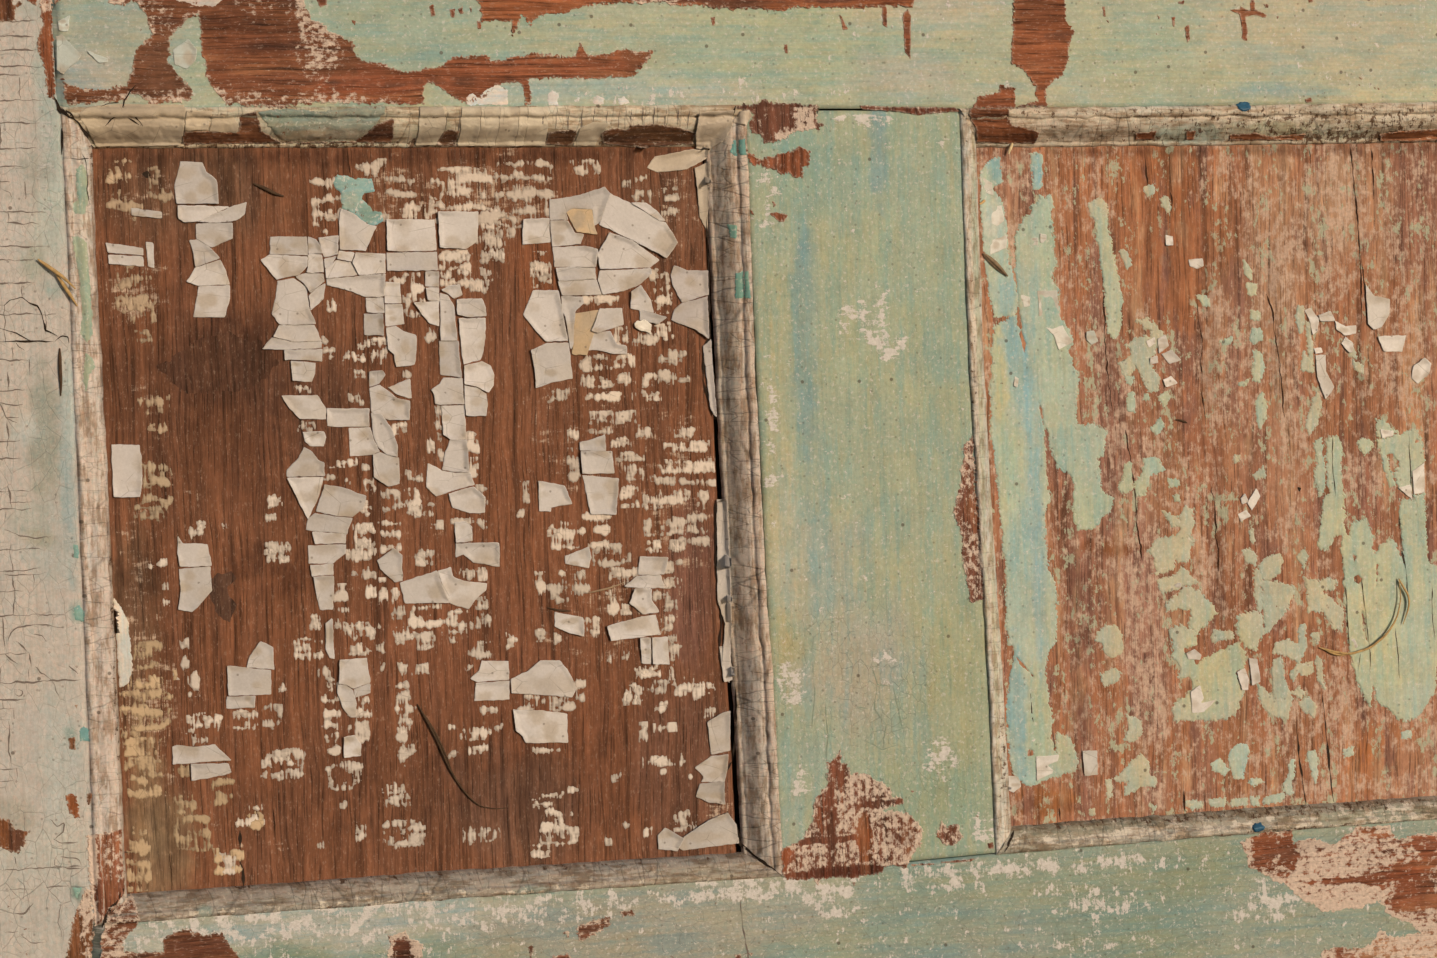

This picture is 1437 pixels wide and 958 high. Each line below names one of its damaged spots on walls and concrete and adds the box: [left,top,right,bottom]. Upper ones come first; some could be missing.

peeling [429,0,914,59]
peeling [860,0,1075,144]
peeling [0,0,824,318]
peeling [522,187,717,417]
crack [0,19,143,782]
peeling [261,209,500,717]
peeling [470,660,577,743]
crack [4,819,84,944]
crack [102,887,125,928]
peeling [66,829,240,958]
peeling [657,711,739,851]
peeling [781,750,974,886]